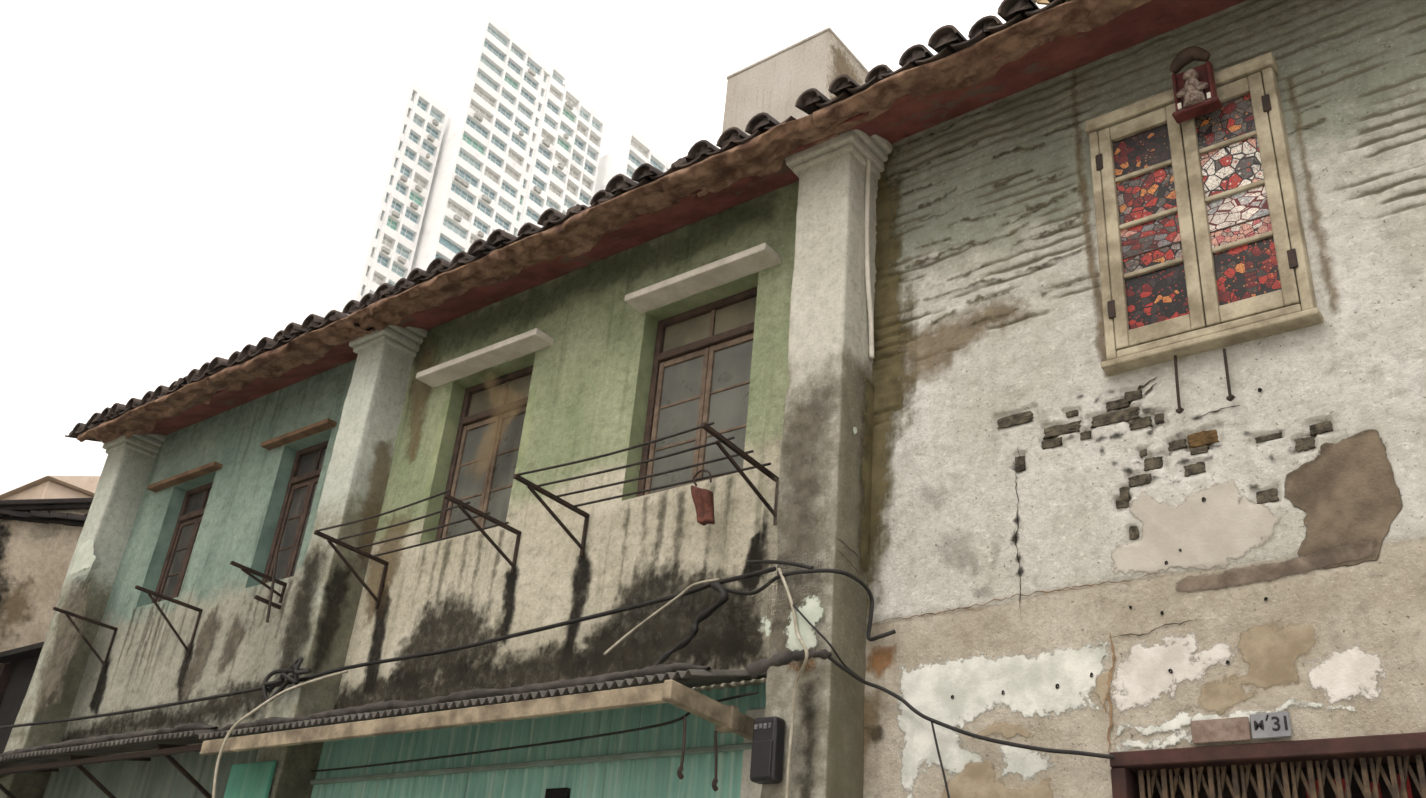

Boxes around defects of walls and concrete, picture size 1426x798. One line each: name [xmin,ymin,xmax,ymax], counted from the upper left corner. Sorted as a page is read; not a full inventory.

damp [408,345,434,460]
damp [0,514,30,636]
damp [37,579,92,707]
damp [61,379,843,742]
peeling [758,595,825,651]
crack [874,448,1176,624]
flaking render [997,389,1402,574]
damp [799,678,819,798]
peeling [897,621,1387,798]